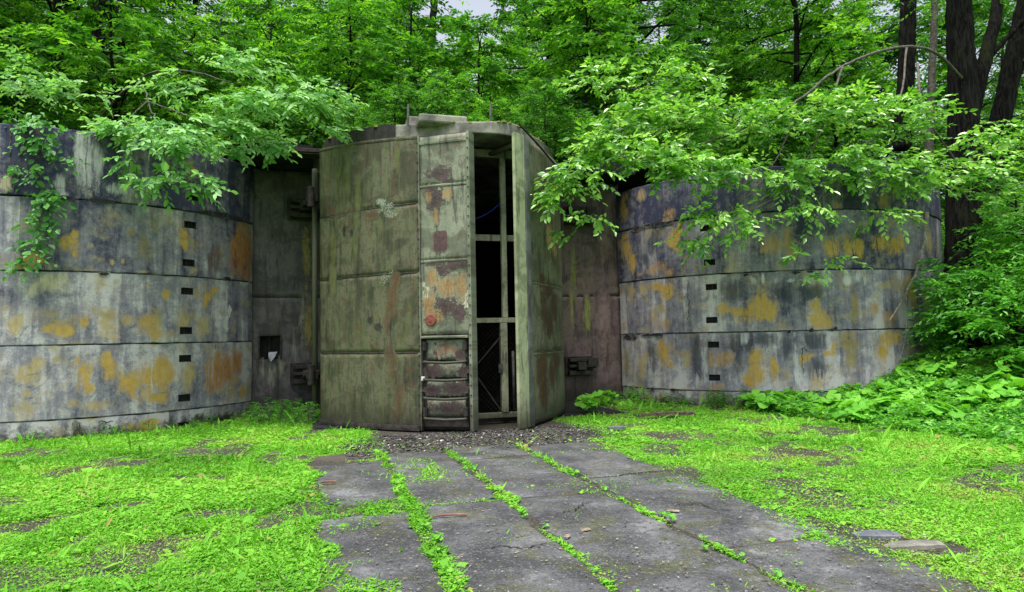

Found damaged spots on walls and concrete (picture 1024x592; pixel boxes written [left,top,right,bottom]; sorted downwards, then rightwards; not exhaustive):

corrosion [425,182,454,228]
water stain [618,186,930,405]
corrosion [199,343,245,405]
corrosion [437,338,458,360]